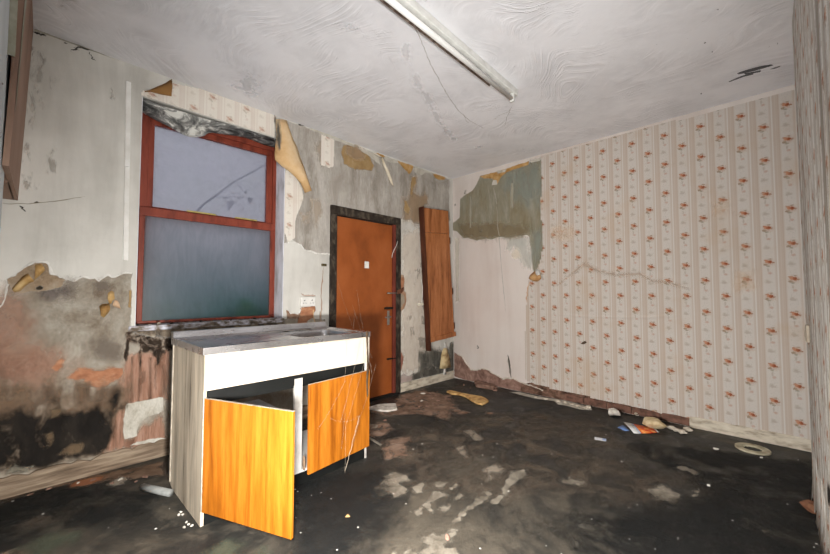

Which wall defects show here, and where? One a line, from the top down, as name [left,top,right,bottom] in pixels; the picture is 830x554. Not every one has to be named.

peeling [145,79,173,96]
flaking render [275,119,543,300]
leakage [0,261,308,478]
flaking render [454,352,693,434]